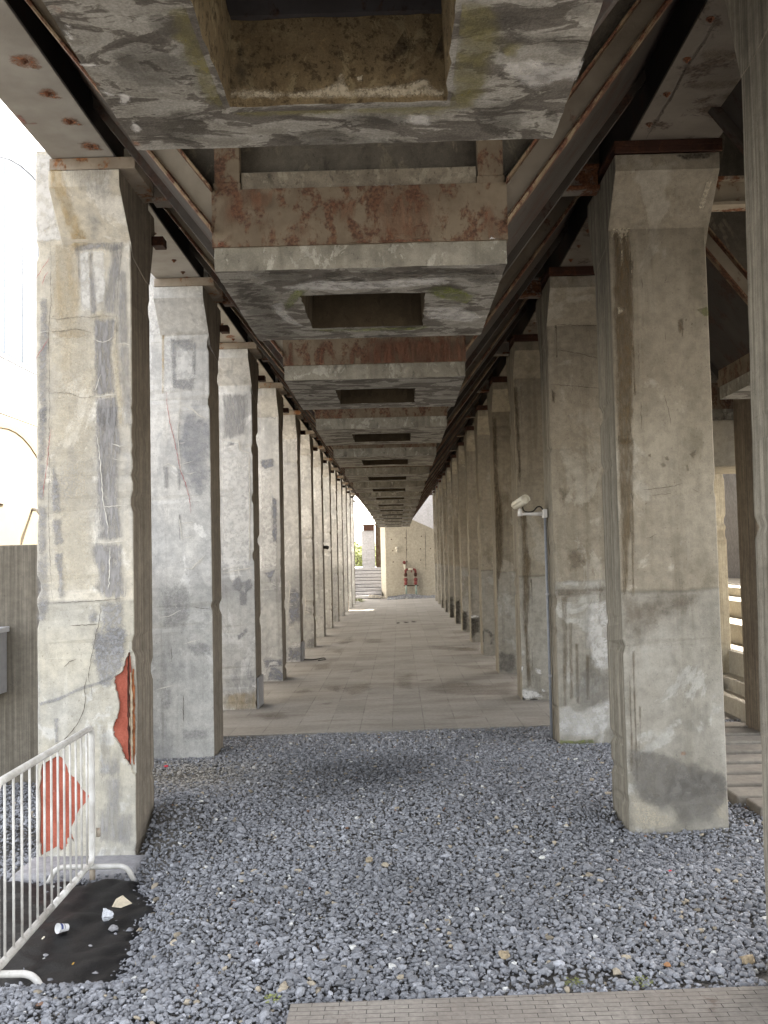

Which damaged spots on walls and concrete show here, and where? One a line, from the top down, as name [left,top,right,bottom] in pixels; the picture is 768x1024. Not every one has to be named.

corrosion [367,339,466,363]
water stain [612,228,636,591]
crack [36,244,122,740]
spalling [113,652,135,764]
water stain [630,691,724,824]